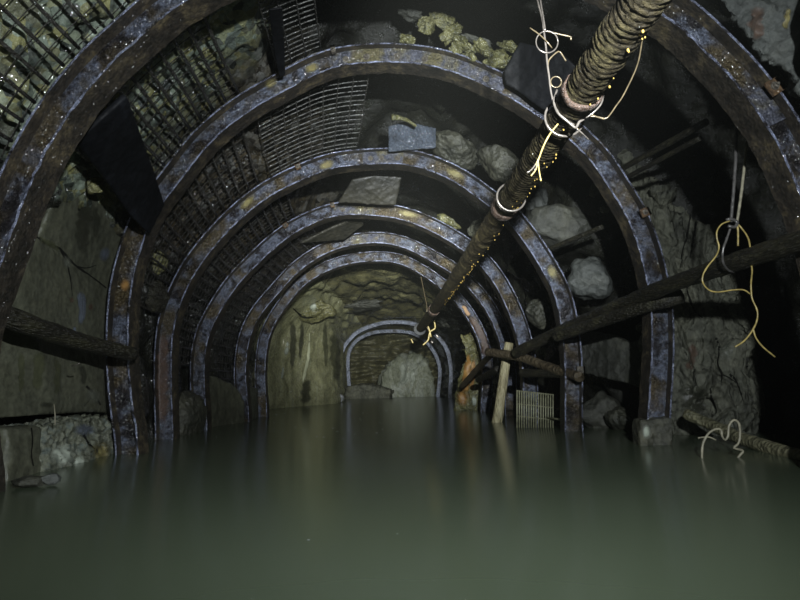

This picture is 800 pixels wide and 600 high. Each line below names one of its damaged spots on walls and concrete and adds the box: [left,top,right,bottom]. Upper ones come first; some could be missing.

crack [37,237,107,296]